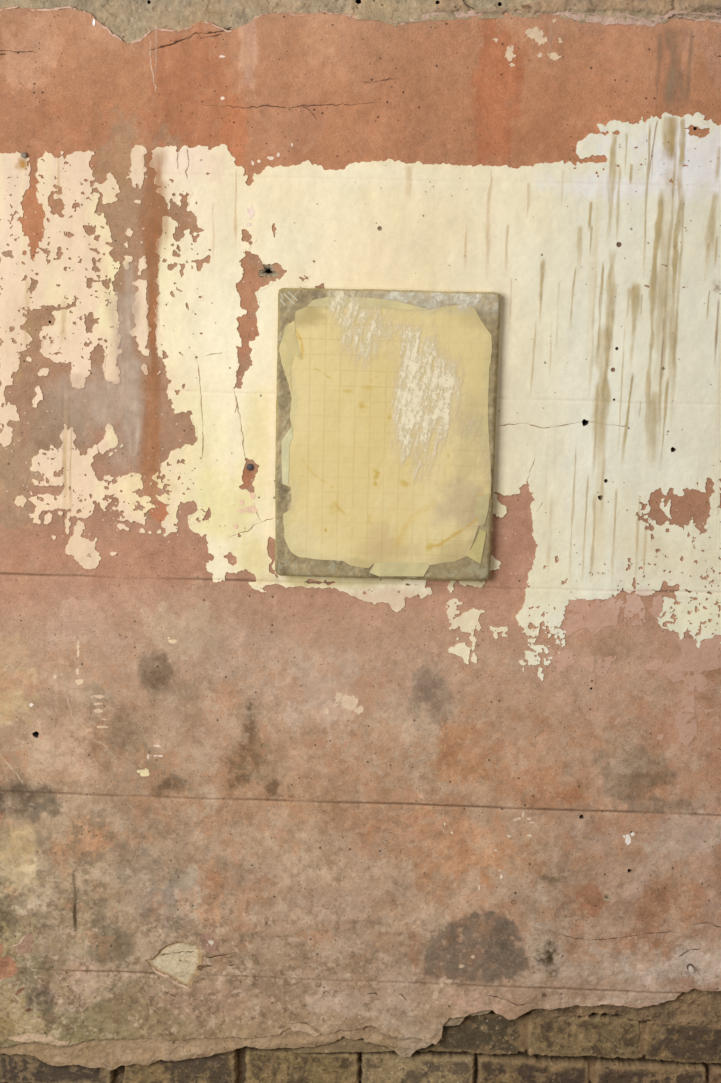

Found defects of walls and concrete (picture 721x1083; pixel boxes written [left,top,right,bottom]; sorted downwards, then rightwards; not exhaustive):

crack [151,27,231,50]
flaking render [0,0,721,44]
crack [201,78,397,115]
water stain [649,118,685,164]
water stain [632,200,662,310]
water stain [672,202,682,289]
peeling [234,229,287,389]
peeling [0,143,211,571]
peeling [485,481,538,584]
peeling [635,477,721,598]
water stain [425,912,555,982]
flaking render [0,1023,432,1070]